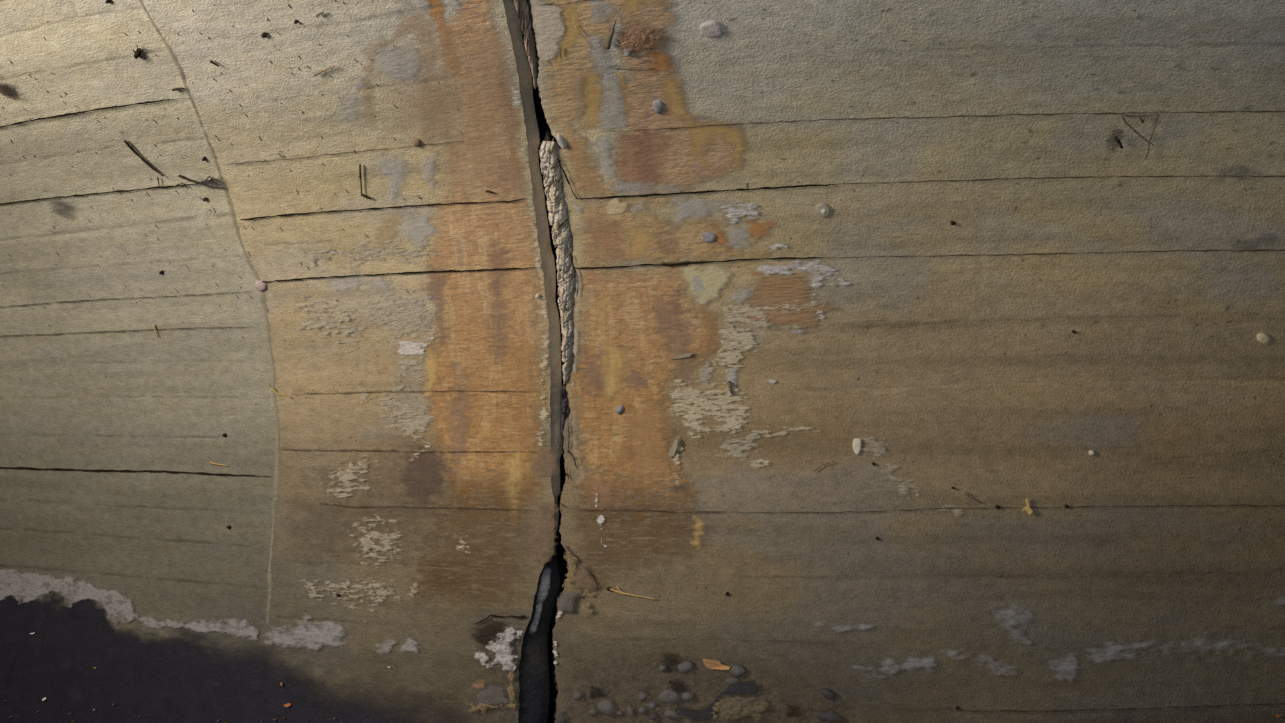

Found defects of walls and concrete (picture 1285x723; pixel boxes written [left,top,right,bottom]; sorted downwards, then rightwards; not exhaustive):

corrosion [406,0,545,513]
crack [0,19,1285,399]
leakage [589,37,758,248]
corrosion [542,0,837,518]
leakage [666,242,855,485]
leakage [0,569,447,723]
leakage [327,455,377,497]
leakage [304,515,417,611]
crack [320,502,525,510]
crack [472,615,526,625]
crack [544,414,1285,721]